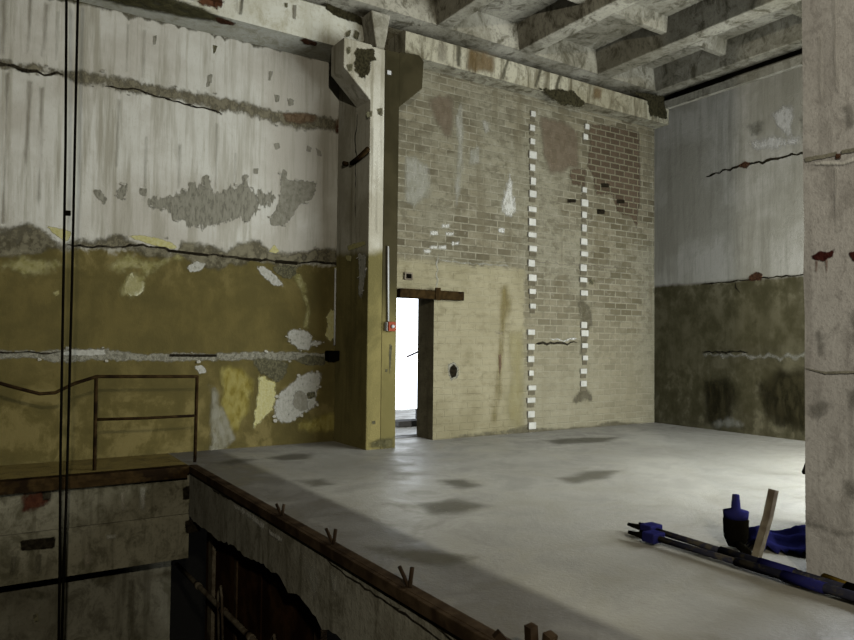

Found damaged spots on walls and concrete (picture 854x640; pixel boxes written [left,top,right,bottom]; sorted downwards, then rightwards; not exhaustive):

spalling [193,0,225,10]
spalling [326,3,376,78]
crack [706,152,803,177]
peeling [94,182,128,205]
peeling [139,168,317,232]
peeling [3,257,60,274]
corrosion [812,249,835,271]
crack [536,338,577,346]
peeling [0,266,335,450]
crack [326,558,455,640]